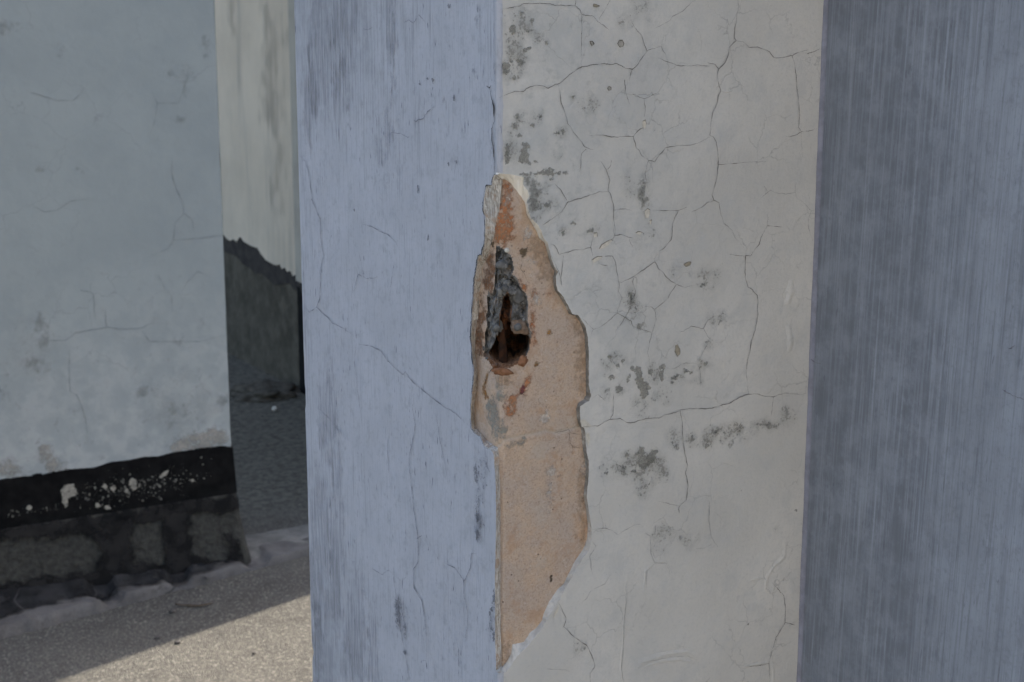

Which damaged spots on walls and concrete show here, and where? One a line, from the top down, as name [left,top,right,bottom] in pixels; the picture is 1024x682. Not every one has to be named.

mould [505,114,566,211]
peeling [8,429,227,518]
crack [303,159,461,679]
spalling [469,173,592,673]
mould [625,447,658,473]
mould [608,355,693,399]
crack [487,1,819,682]